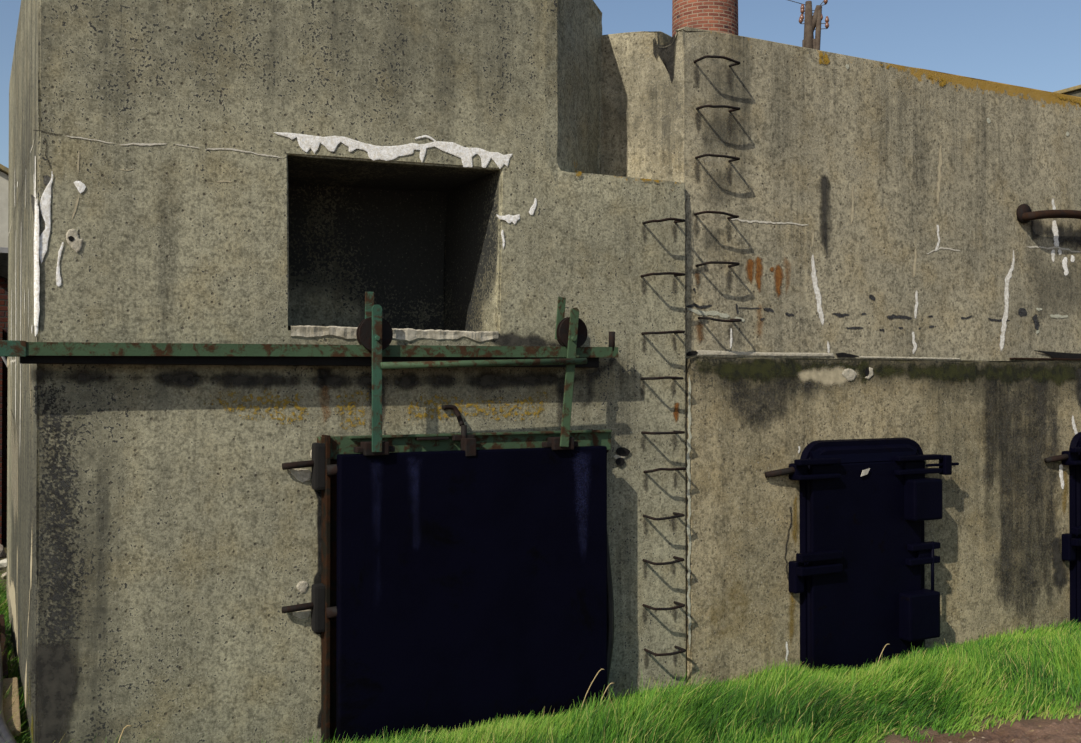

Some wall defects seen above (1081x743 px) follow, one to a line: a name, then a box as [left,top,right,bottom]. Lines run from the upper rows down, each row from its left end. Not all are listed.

water stain [688,308,745,348]
corrosion [747,257,788,297]
water stain [811,175,831,325]
water stain [913,225,960,277]
water stain [1000,250,1015,351]
water stain [1031,198,1081,312]
water stain [155,370,299,388]
water stain [313,368,454,419]
water stain [470,358,615,425]
water stain [671,332,1081,650]
water stain [11,367,114,743]
peeling [8,535,33,741]